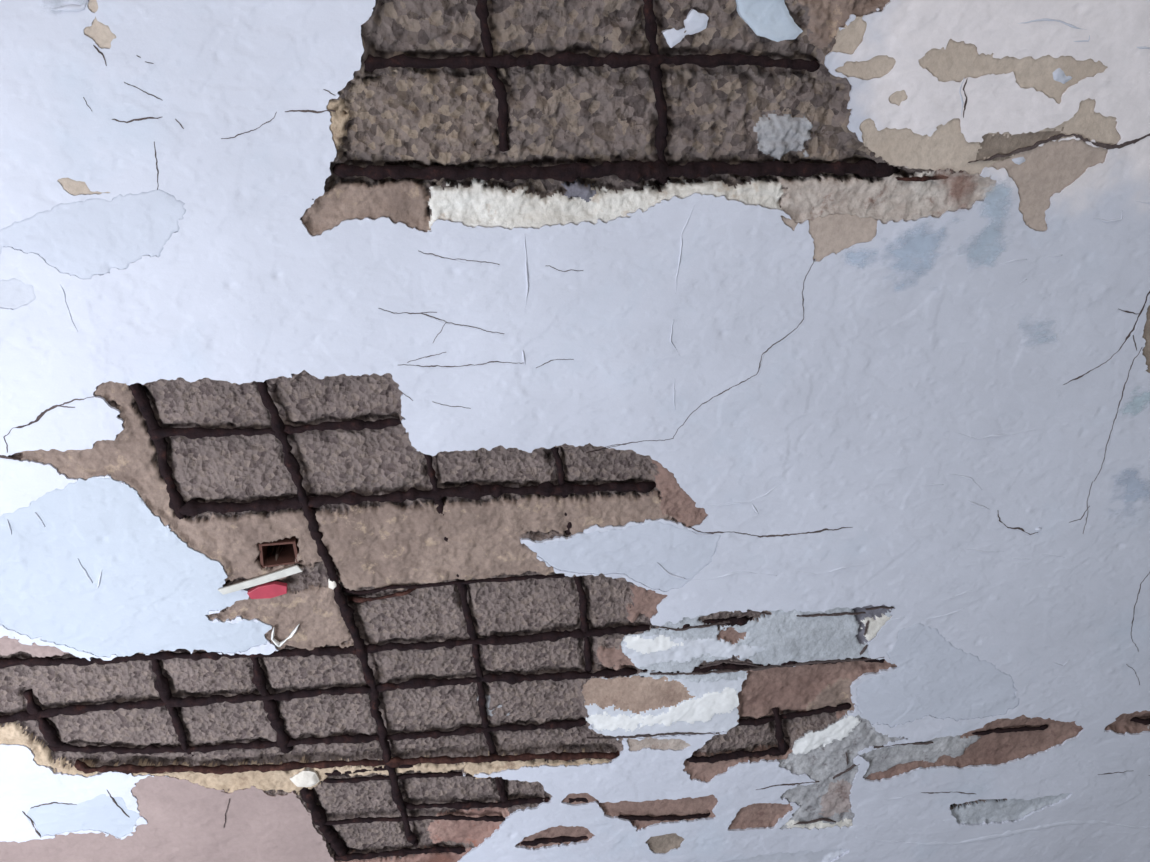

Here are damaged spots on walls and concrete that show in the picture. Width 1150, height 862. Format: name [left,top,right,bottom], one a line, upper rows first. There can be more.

peeling [84,0,116,49]
spalling [300,0,1121,262]
crack [968,134,1150,163]
crack [586,259,816,454]
crack [1063,291,1150,533]
peeling [1142,305,1150,373]
spalling [0,370,1083,862]
spalling [1104,710,1150,734]